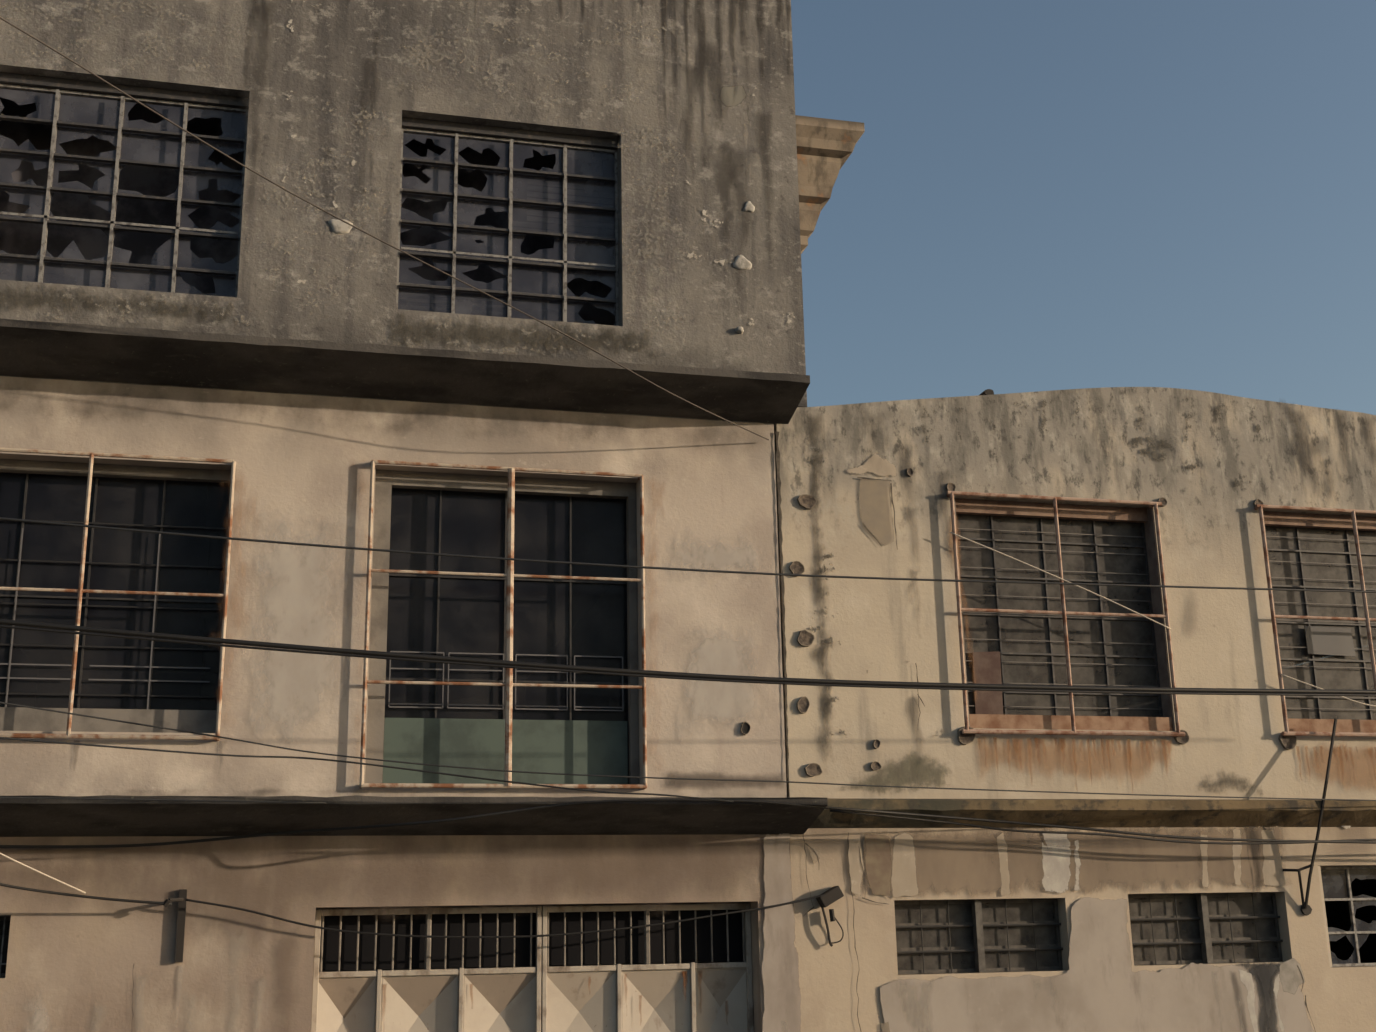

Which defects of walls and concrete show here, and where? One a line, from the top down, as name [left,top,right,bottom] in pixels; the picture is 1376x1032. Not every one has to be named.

water stain [685,0,790,82]
water stain [1122,398,1197,461]
water stain [847,453,896,546]
water stain [807,419,846,746]
peeling [848,839,864,895]
peeling [891,832,919,898]
peeling [997,833,1010,896]
peeling [1041,833,1081,893]
peeling [1232,829,1242,885]
peeling [1261,830,1286,886]
water stain [880,897,1315,1032]
peeling [1238,969,1258,1032]